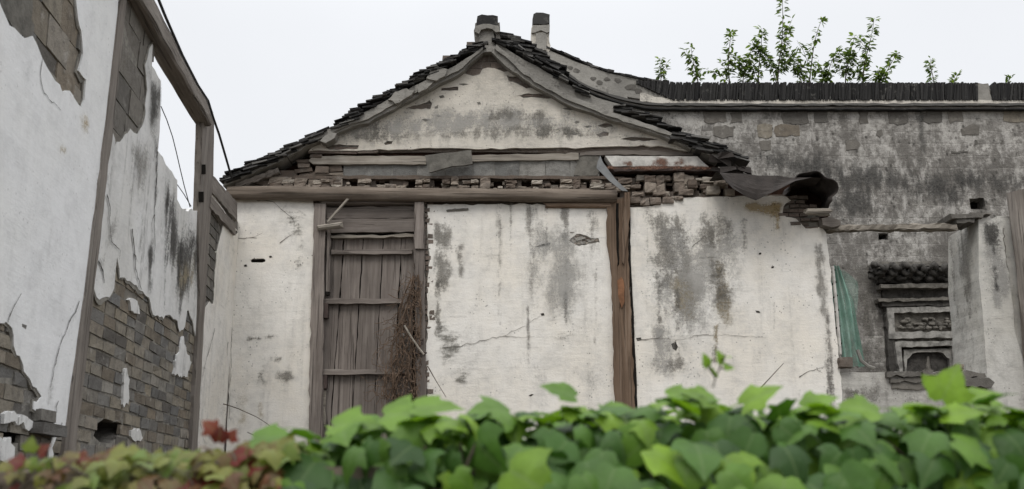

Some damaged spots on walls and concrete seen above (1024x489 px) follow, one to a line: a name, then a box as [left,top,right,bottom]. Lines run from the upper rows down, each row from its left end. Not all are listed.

spalling [0,0,84,106]
spalling [113,0,155,145]
water stain [151,82,161,127]
water stain [341,109,603,139]
spalling [0,323,62,470]
spalling [76,262,195,457]
water stain [156,181,198,310]
water stain [434,223,463,336]
crack [443,318,536,348]
peeling [569,232,600,246]
water stain [650,215,745,372]
water stain [766,154,1024,215]